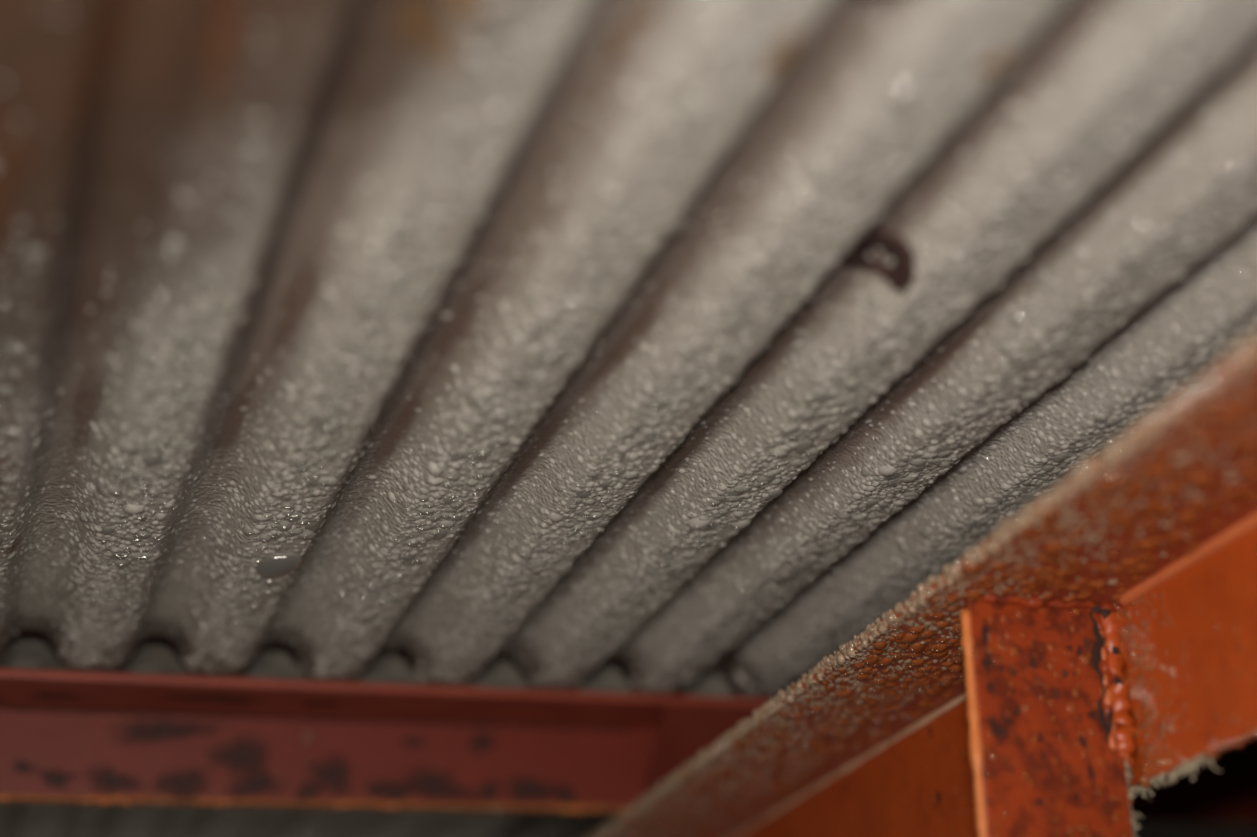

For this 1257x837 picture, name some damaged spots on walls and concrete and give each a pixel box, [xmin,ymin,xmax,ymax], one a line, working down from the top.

rust [0,794,630,814]